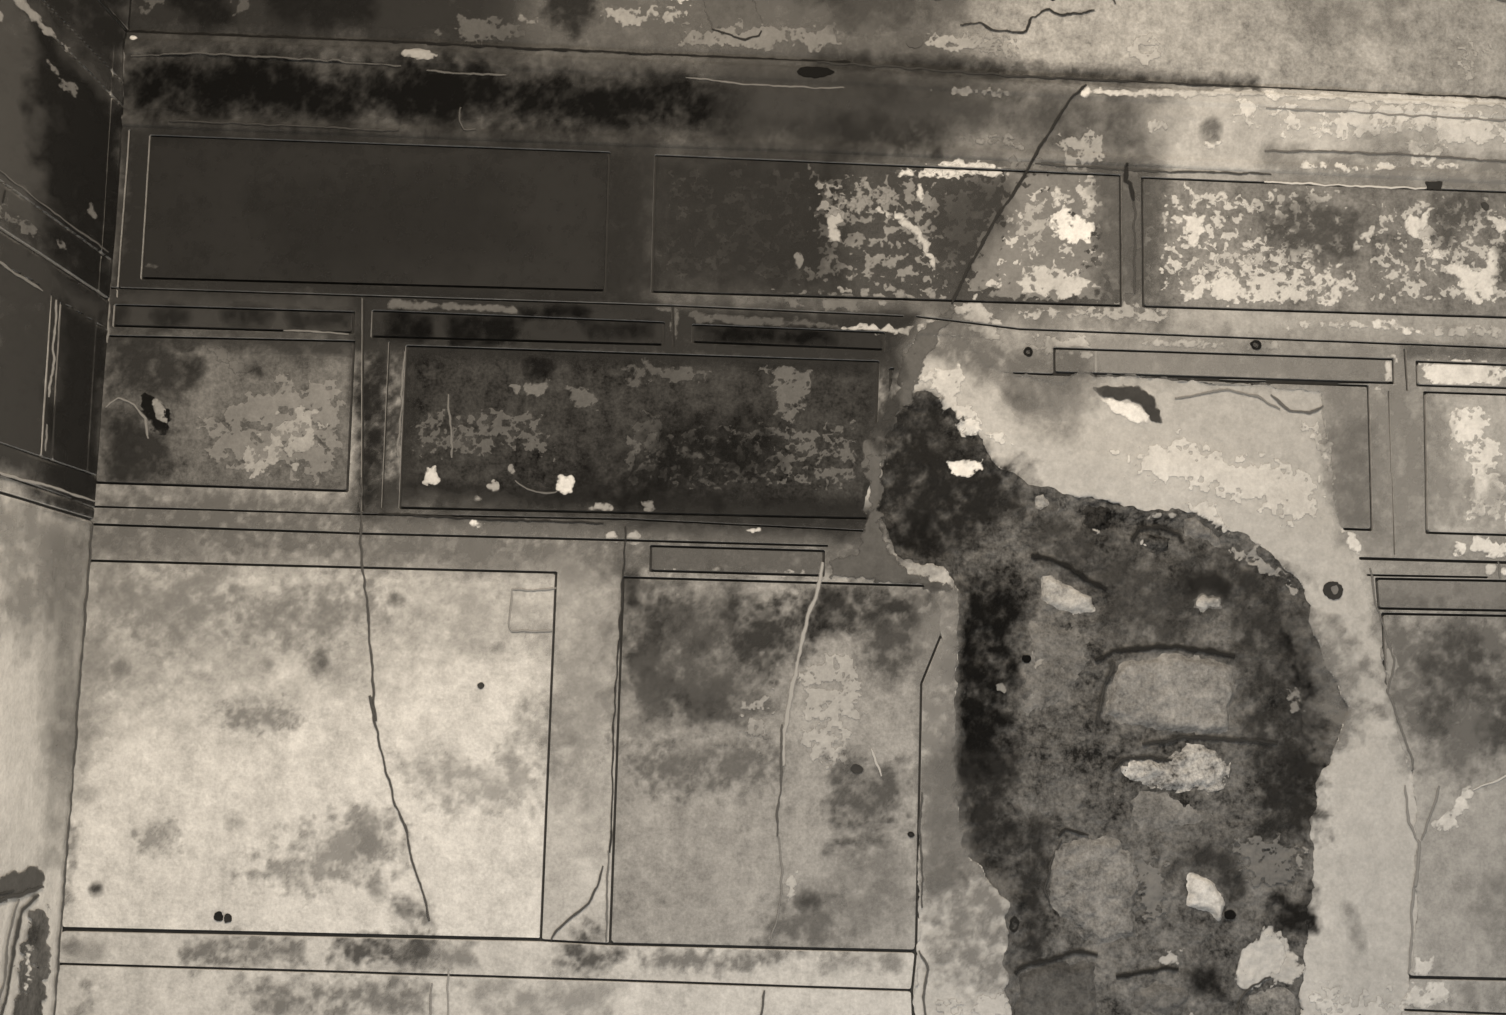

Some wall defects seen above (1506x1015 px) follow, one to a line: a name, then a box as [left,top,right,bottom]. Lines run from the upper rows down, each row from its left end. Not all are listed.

flaking render [600,0,844,53]
flaking render [925,30,1019,59]
crack [960,0,1116,34]
flaking render [1080,33,1506,108]
crack [129,29,1506,304]
crack [396,351,405,457]
spalling [589,503,614,511]
spalling [606,530,641,545]
spalling [621,128,1506,1015]
damp [0,306,1051,994]
crack [359,477,627,942]
crack [771,724,783,939]